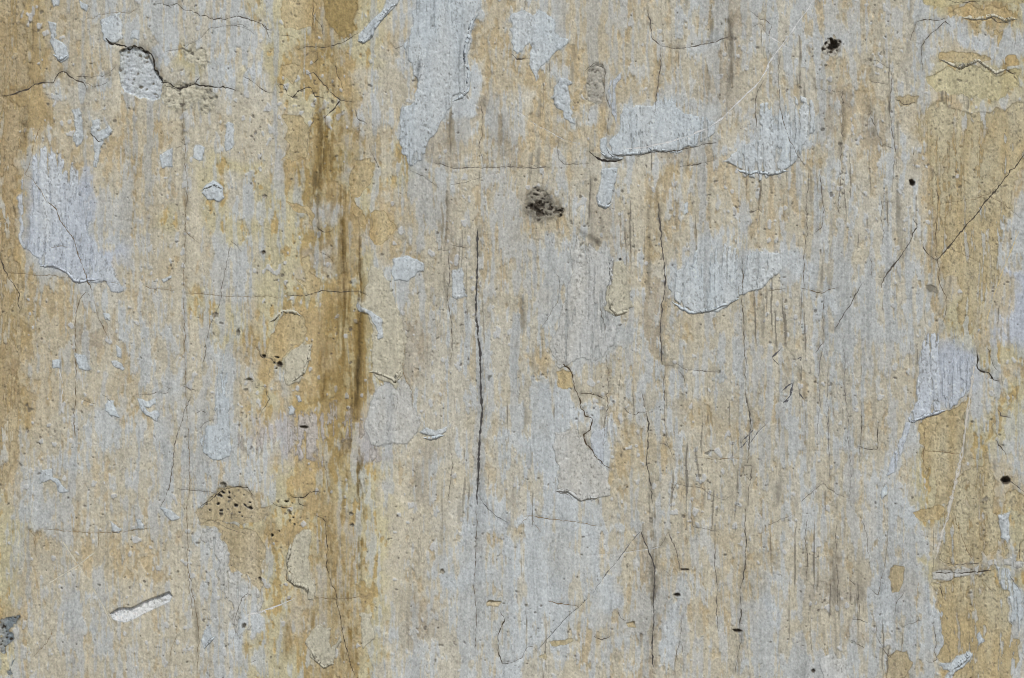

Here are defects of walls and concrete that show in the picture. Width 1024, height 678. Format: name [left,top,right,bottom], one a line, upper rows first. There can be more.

flaking render [100,13,218,115]
peeling [399,0,480,166]
peeling [585,62,715,160]
peeling [724,96,815,180]
peeling [0,0,124,489]
crack [0,3,366,675]
crack [438,230,599,664]
peeling [668,244,781,314]
crack [563,10,1024,673]
peeling [897,51,1024,678]
spalling [110,592,172,622]
peeling [195,485,316,638]